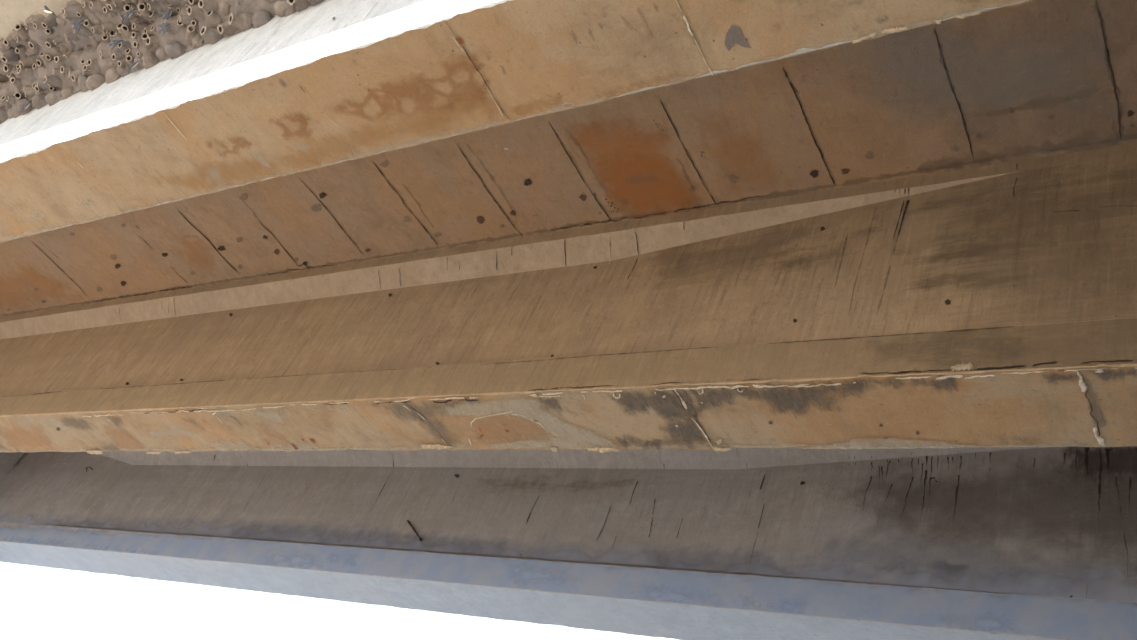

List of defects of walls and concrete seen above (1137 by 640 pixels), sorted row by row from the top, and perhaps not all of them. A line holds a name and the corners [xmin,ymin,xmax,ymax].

crack [653,100,716,203]
crack [783,68,835,184]
crack [934,28,974,160]
damp [447,381,866,449]
damp [888,376,956,390]
damp [0,439,1137,640]